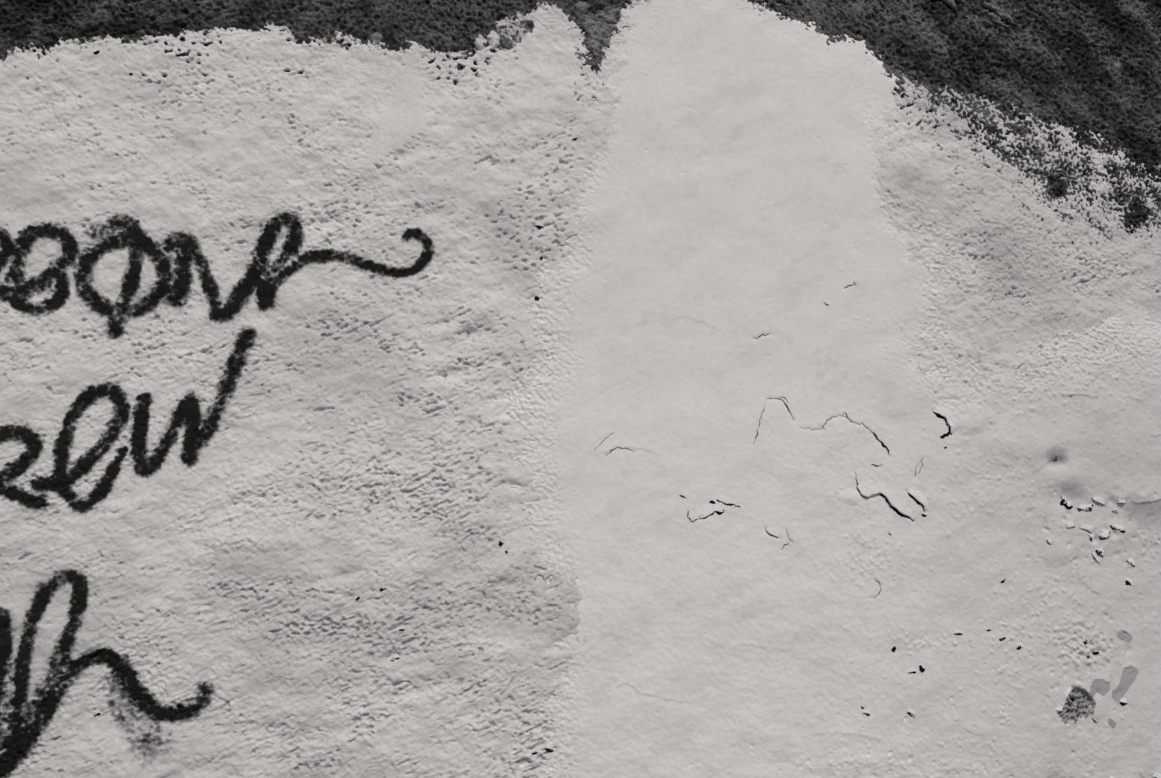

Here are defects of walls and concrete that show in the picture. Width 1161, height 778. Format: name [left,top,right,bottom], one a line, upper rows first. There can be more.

crack [754,397,955,521]
peeling [1060,496,1126,564]
spalling [1055,667,1139,728]